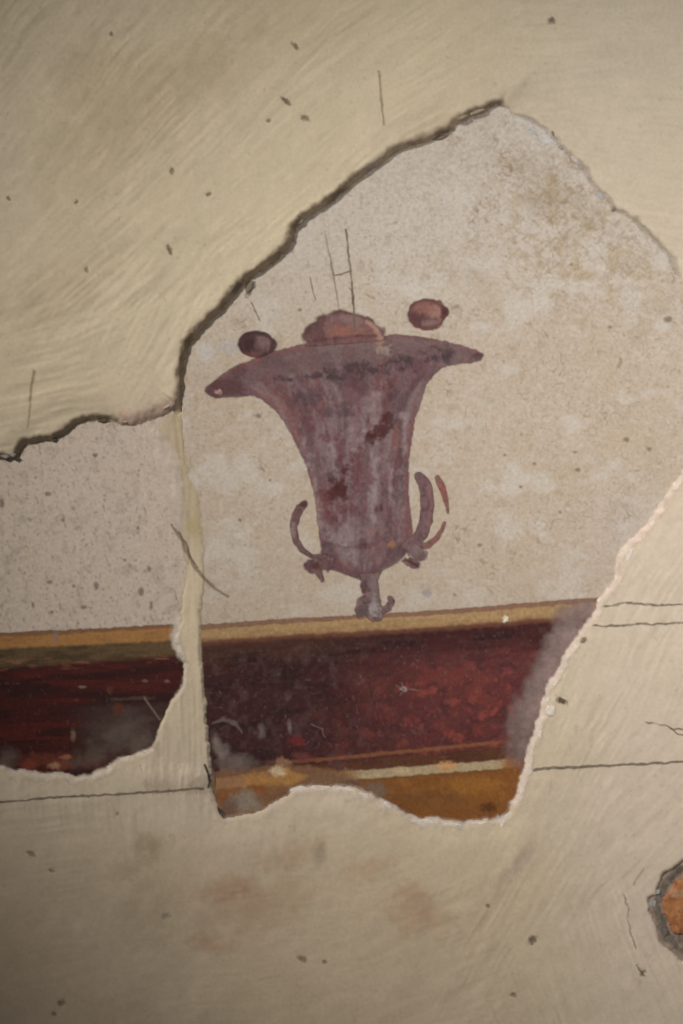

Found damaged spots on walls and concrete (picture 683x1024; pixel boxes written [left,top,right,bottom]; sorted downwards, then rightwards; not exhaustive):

spalling [0,100,503,460]
spalling [0,747,153,783]
spalling [290,470,683,830]
spalling [648,861,683,961]